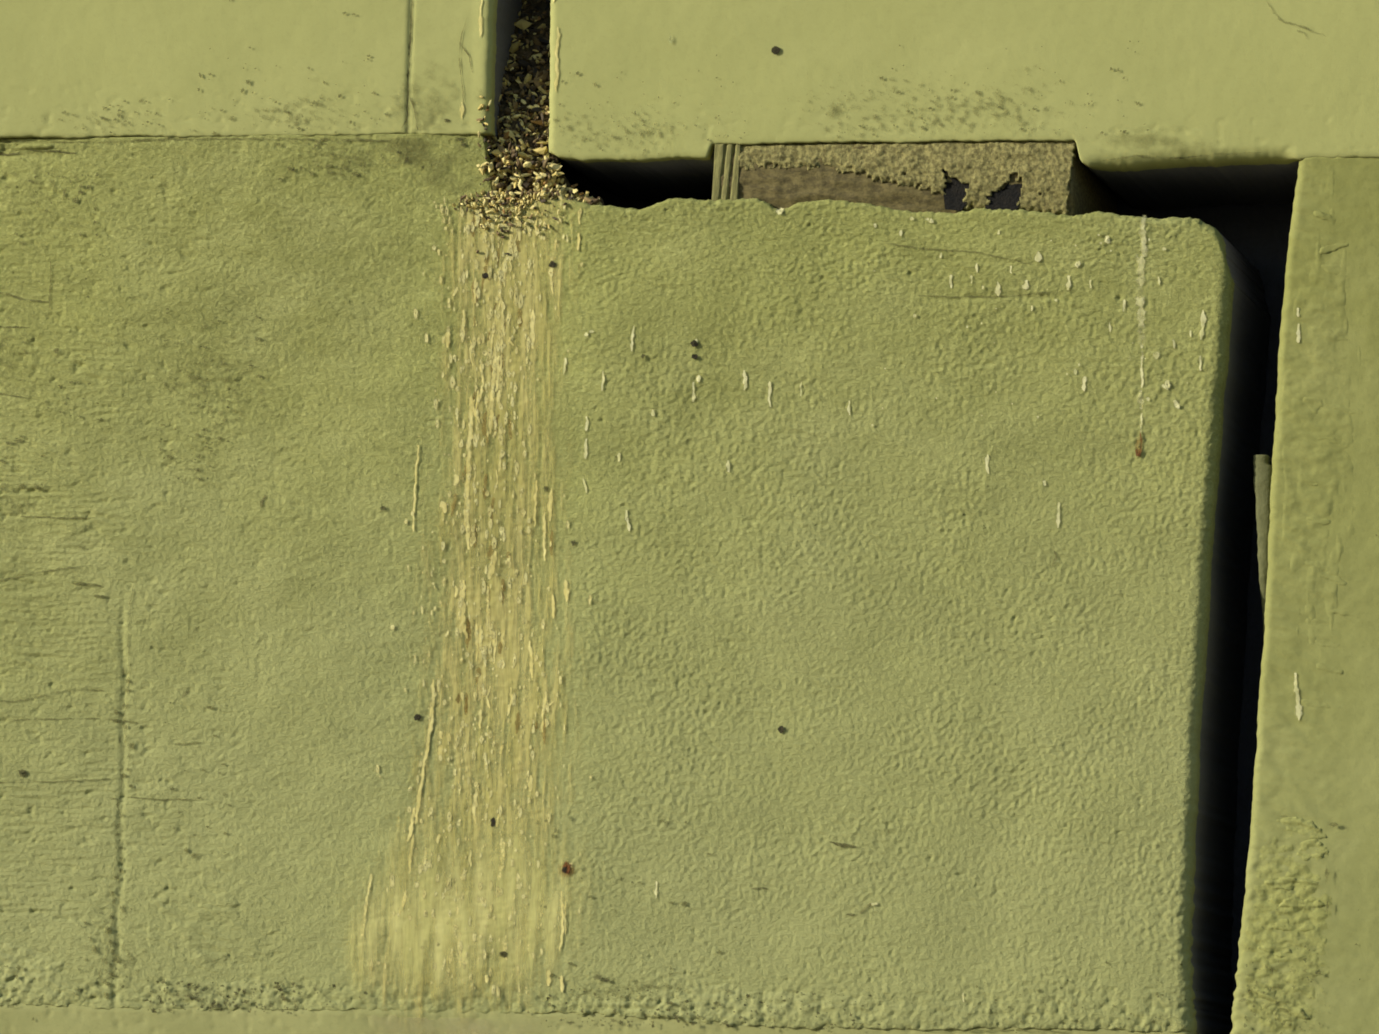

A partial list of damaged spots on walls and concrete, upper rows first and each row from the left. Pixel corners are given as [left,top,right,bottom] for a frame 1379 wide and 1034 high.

spalling [942,169,969,211]
spalling [985,177,1022,211]
spalling [81,826,336,1014]